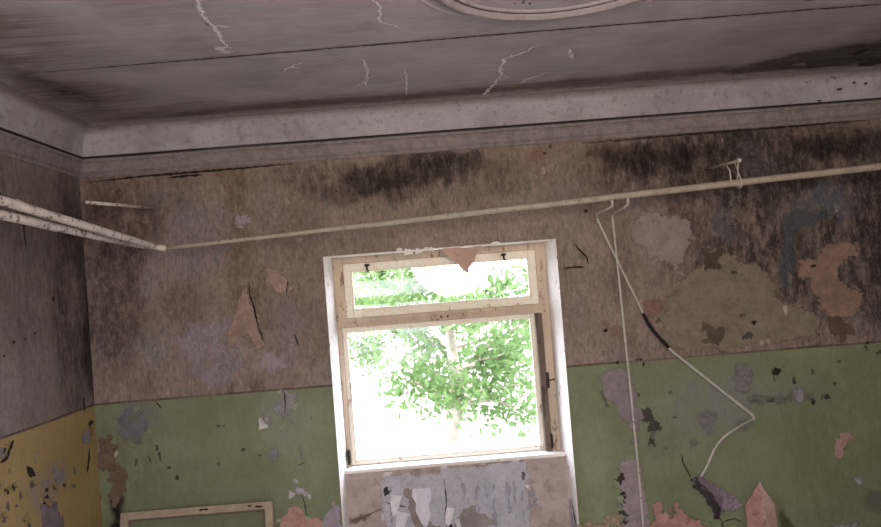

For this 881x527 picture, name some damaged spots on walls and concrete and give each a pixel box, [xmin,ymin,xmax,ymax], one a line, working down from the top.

crack [49,0,881,95]
damp [733,43,881,74]
peeling [225,283,265,350]
peeling [629,210,881,358]
spalling [0,406,179,527]
spalling [274,479,343,527]
peeling [380,460,538,527]
flaking render [568,360,668,527]